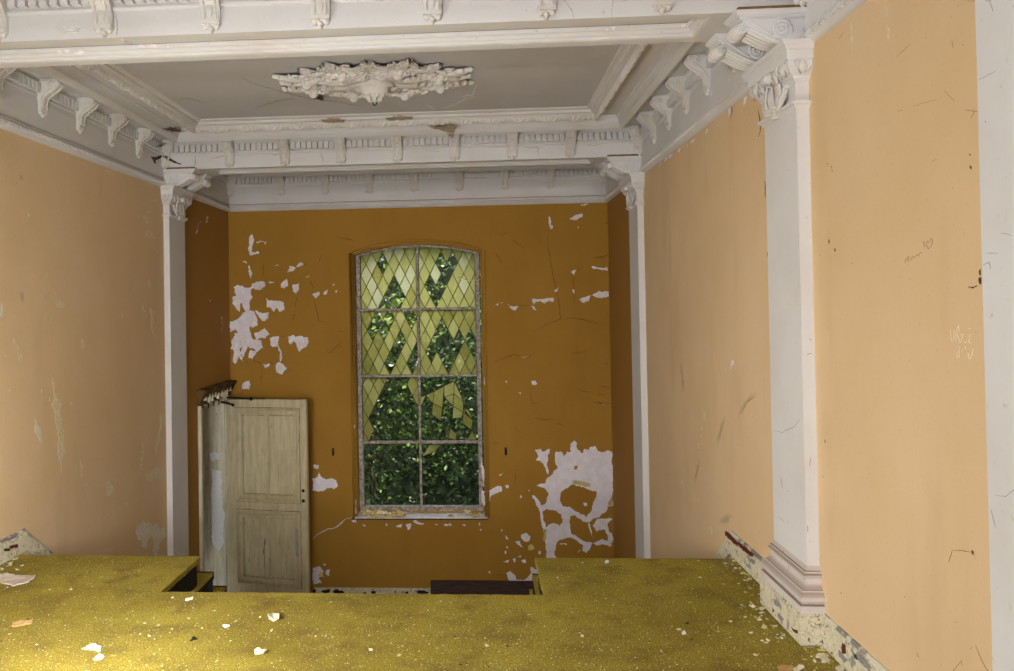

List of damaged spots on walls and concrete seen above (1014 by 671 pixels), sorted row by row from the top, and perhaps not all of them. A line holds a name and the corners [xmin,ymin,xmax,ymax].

peeling [221,234,309,375]
peeling [572,289,609,303]
peeling [312,465,338,492]
peeling [481,462,509,506]
peeling [501,441,613,581]